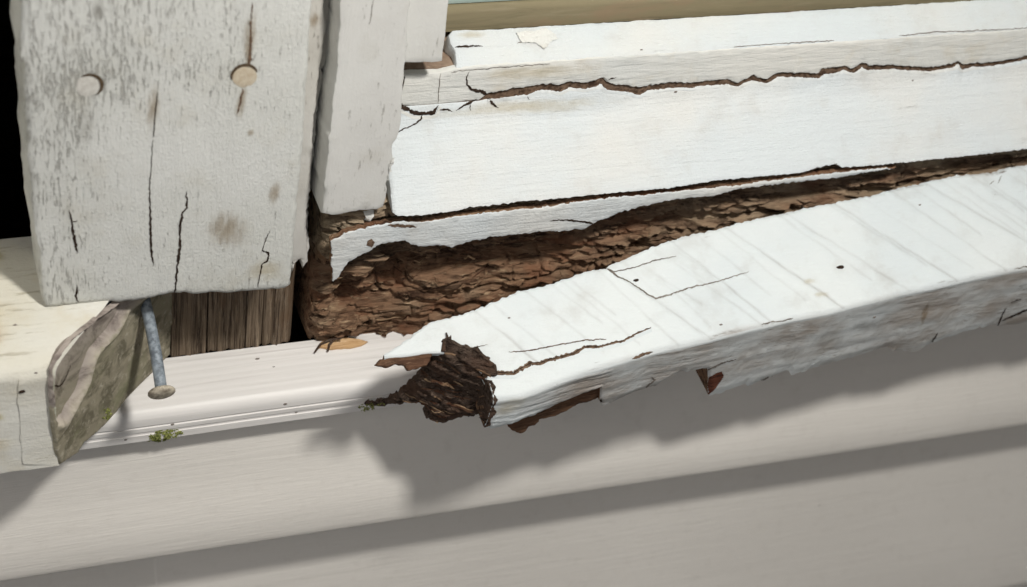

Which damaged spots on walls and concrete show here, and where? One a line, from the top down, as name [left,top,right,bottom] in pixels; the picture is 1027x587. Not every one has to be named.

crack [231,3,257,114]
crack [735,39,834,47]
crack [899,27,1027,36]
crack [398,45,1027,133]
crack [149,92,188,292]
crack [69,211,78,253]
crack [258,231,270,283]
crack [607,256,747,299]
crack [998,299,1027,325]
crack [481,327,656,388]
spalling [477,379,498,428]
spalling [707,372,724,394]